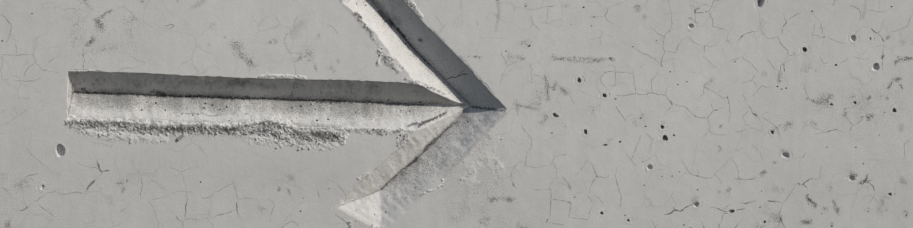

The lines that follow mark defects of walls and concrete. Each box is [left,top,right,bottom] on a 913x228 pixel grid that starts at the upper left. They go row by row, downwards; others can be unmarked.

crack [1,14,116,84]
crack [509,0,913,228]
crack [3,151,298,228]